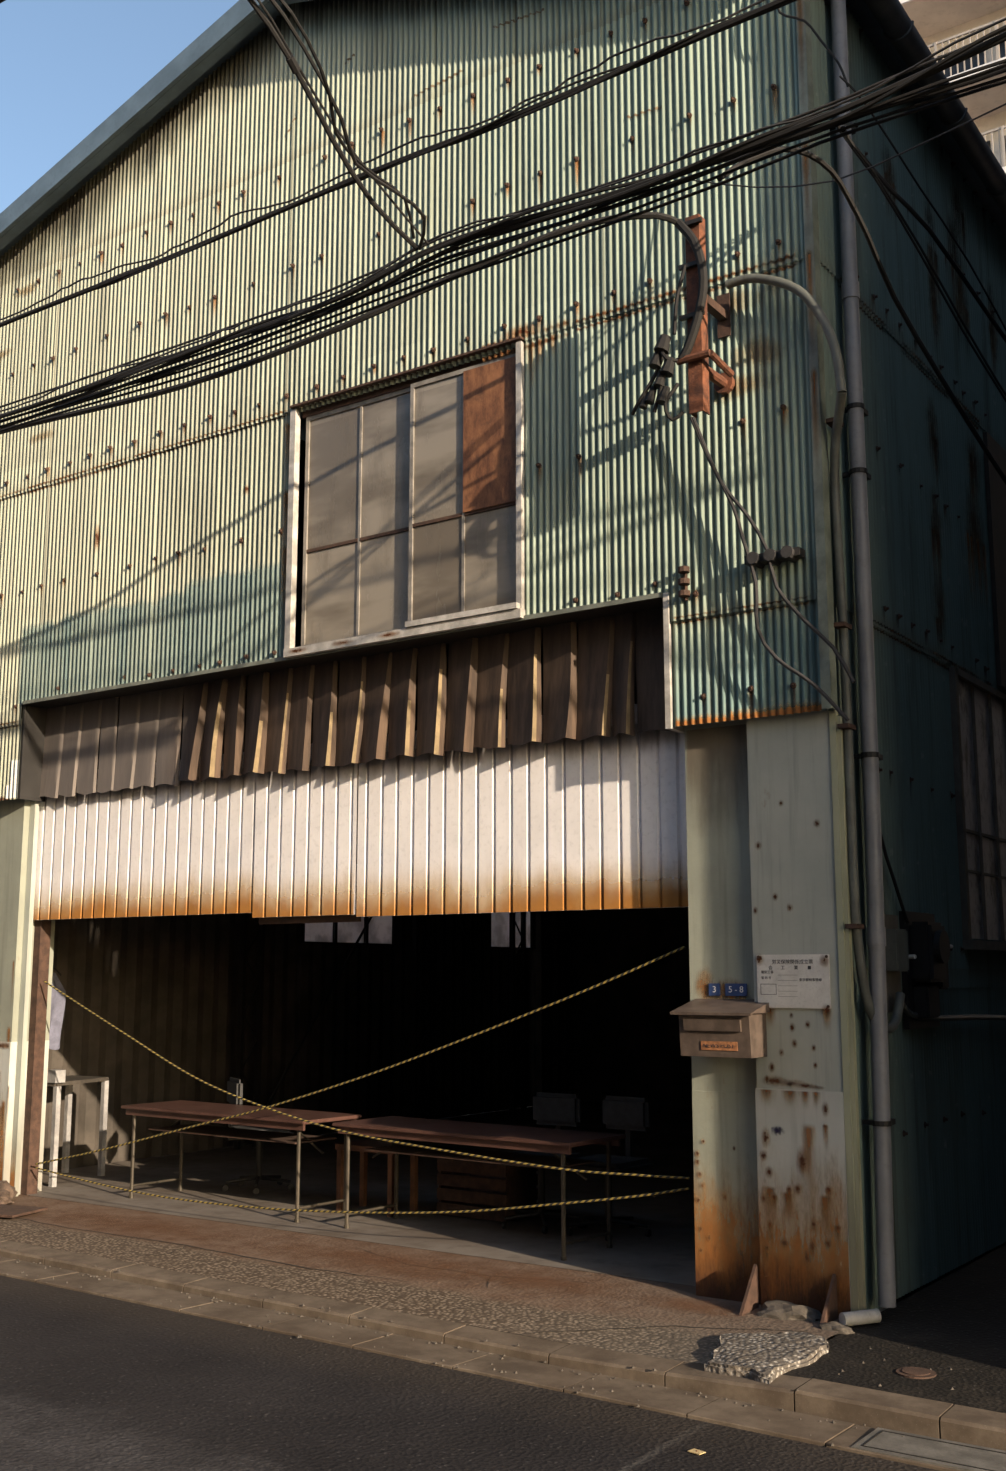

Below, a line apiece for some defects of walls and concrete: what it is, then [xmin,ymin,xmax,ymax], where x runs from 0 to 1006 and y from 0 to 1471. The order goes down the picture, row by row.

corrosion [33,878,688,920]
corrosion [697,975,746,999]
corrosion [0,1086,15,1187]
corrosion [762,1007,830,1168]
corrosion [694,1132,851,1319]